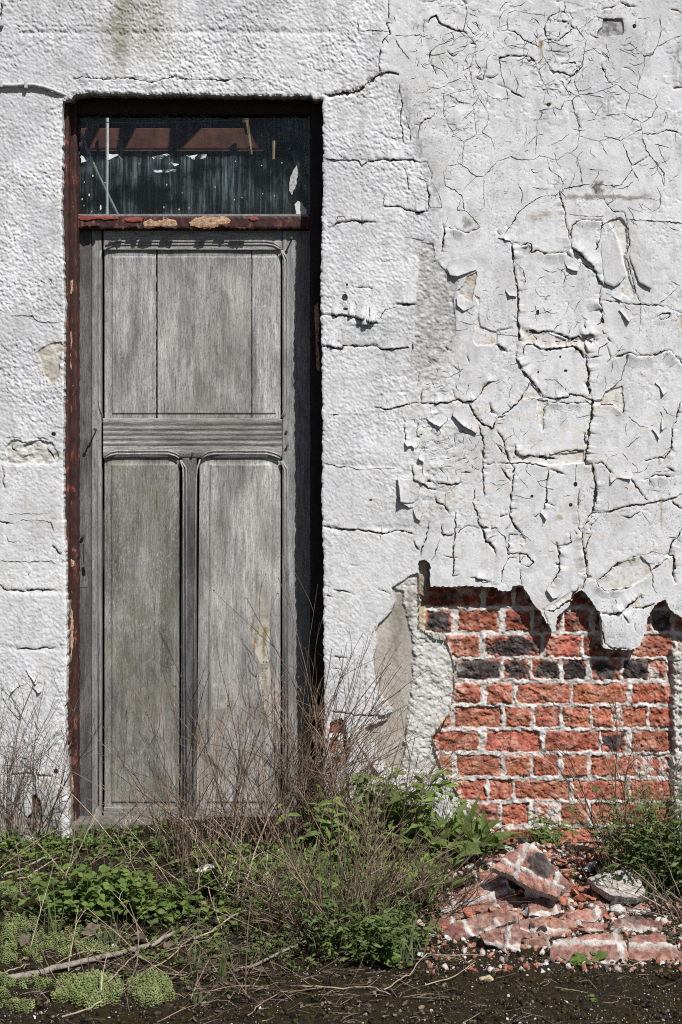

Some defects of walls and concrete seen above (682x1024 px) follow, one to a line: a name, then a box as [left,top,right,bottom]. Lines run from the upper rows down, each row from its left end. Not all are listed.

crack [75,76,261,91]
spalling [5,432,59,467]
crack [321,0,682,649]
spalling [324,556,682,844]